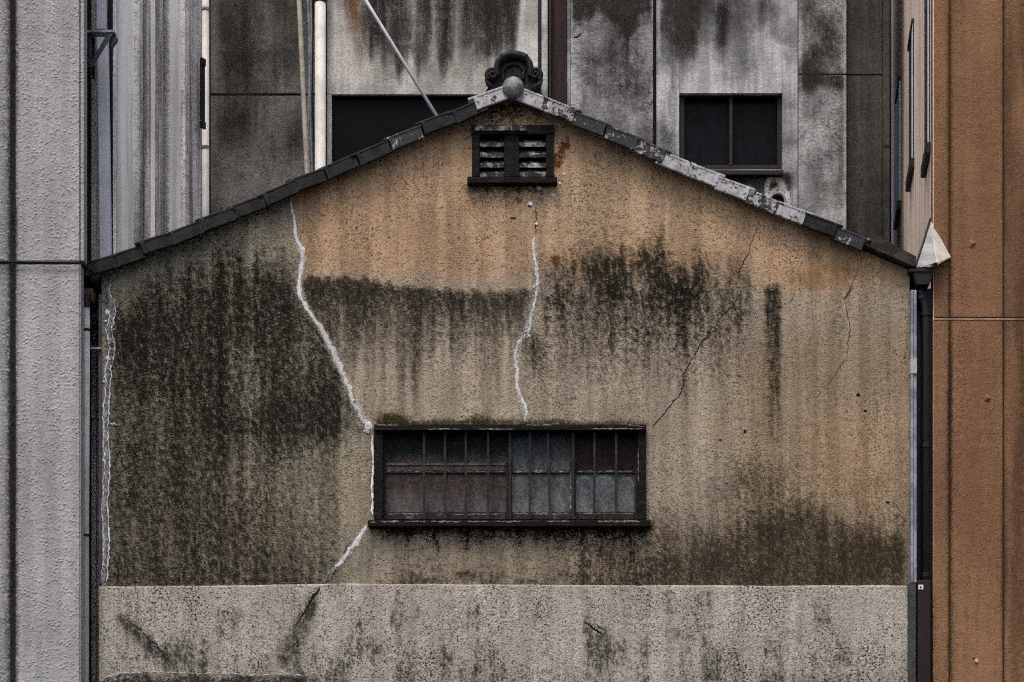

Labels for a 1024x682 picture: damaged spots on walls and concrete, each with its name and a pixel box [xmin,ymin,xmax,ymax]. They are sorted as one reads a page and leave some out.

damp [363,0,520,75]
rust [554,135,570,167]
damp [573,0,773,66]
damp [725,172,791,194]
damp [802,9,843,90]
crack [101,284,118,583]
crack [289,197,374,584]
damp [107,230,905,682]
crack [514,207,540,421]
crack [653,221,760,426]